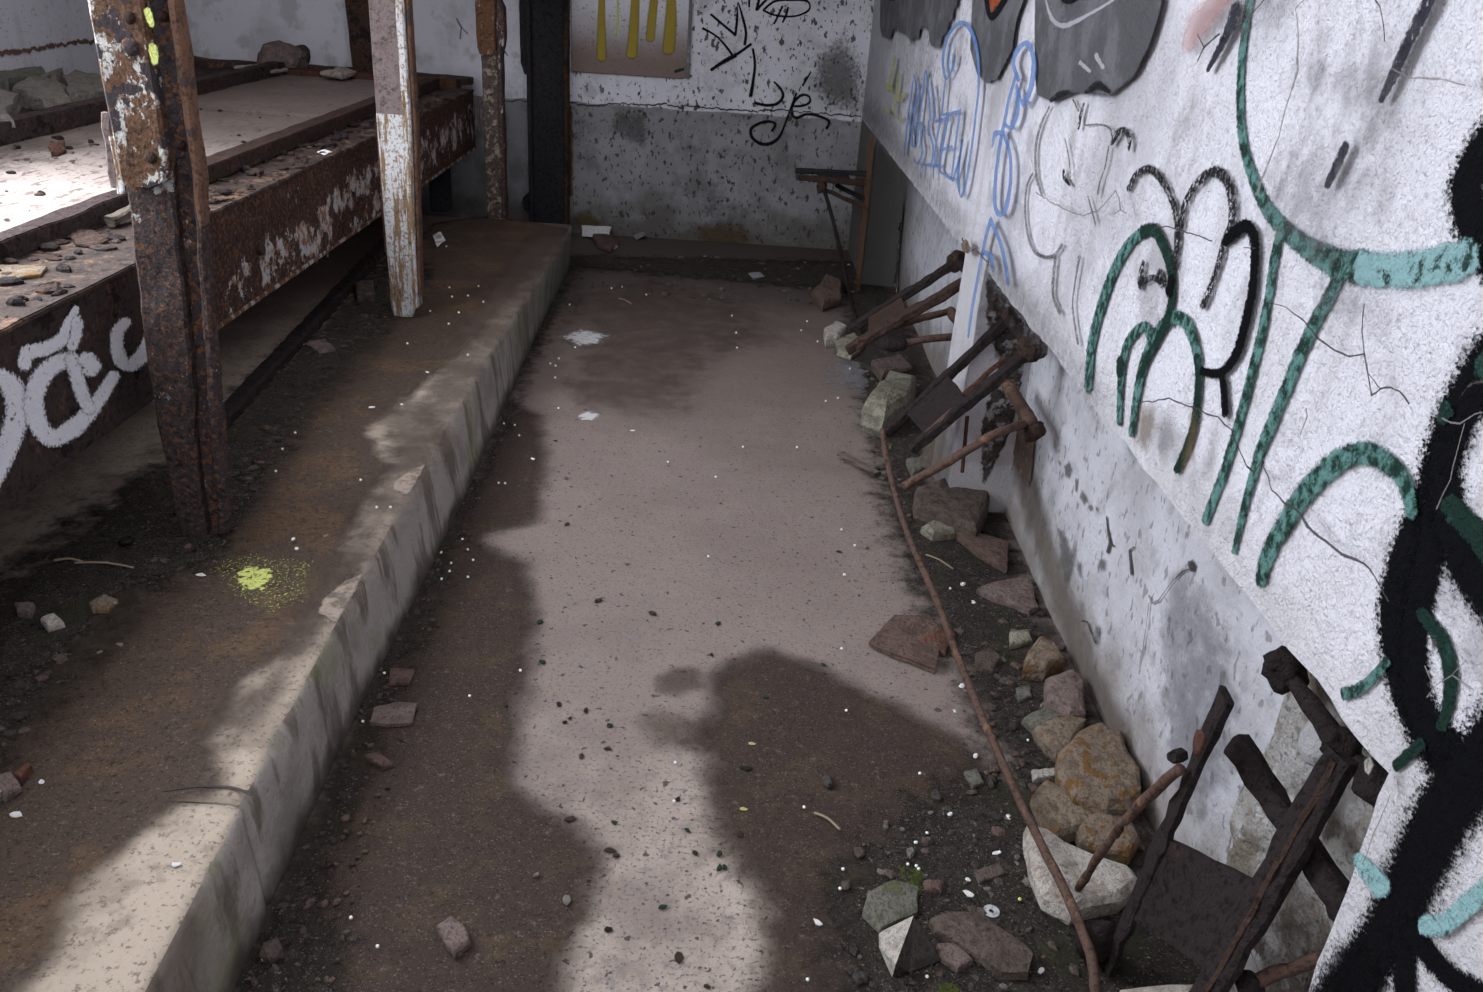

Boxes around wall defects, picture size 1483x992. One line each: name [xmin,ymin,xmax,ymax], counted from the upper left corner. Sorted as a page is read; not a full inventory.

rust [0,38,95,57]
crack [1197,0,1304,195]
rust [0,125,100,221]
rust [209,114,376,210]
rust [0,229,133,319]
crack [1265,302,1410,405]
crack [1138,397,1389,602]
crack [1436,412,1483,510]
flaking render [1263,670,1348,803]
flaking render [1227,785,1277,877]
flaking render [1319,746,1374,881]
flaking render [1251,871,1334,992]